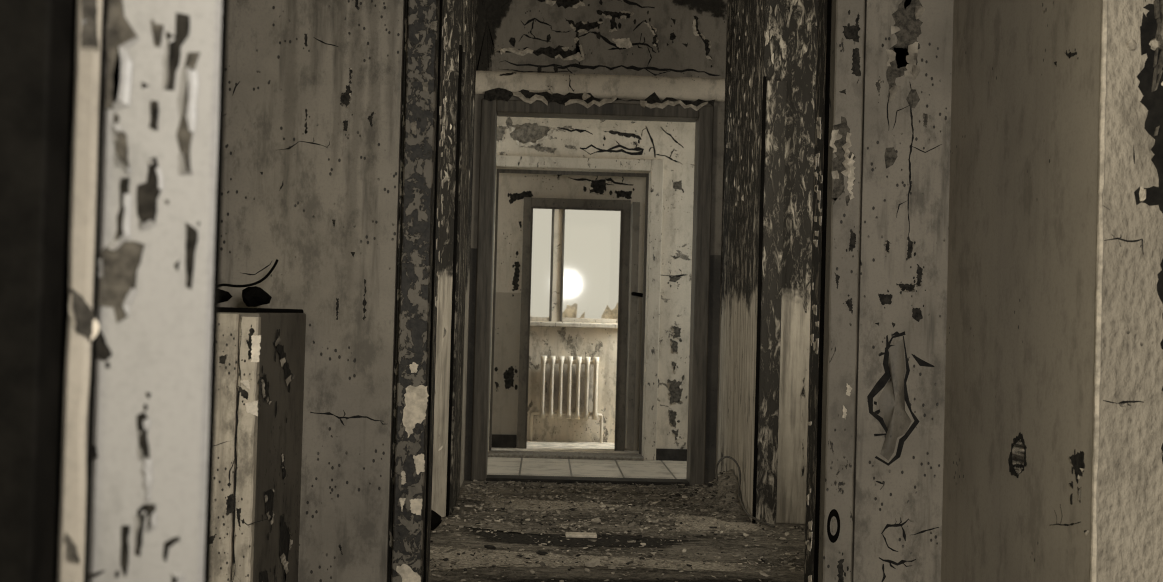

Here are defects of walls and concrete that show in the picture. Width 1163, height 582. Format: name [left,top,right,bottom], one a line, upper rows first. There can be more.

peeling [149,12,200,175]
peeling [497,117,557,155]
peeling [471,83,715,111]
peeling [495,0,713,73]
peeling [603,130,642,146]
peeling [726,0,794,207]
peeling [842,10,861,76]
peeling [875,0,928,128]
peeling [1127,0,1163,213]
peeling [69,0,169,369]
peeling [583,178,635,199]
peeling [174,222,200,289]